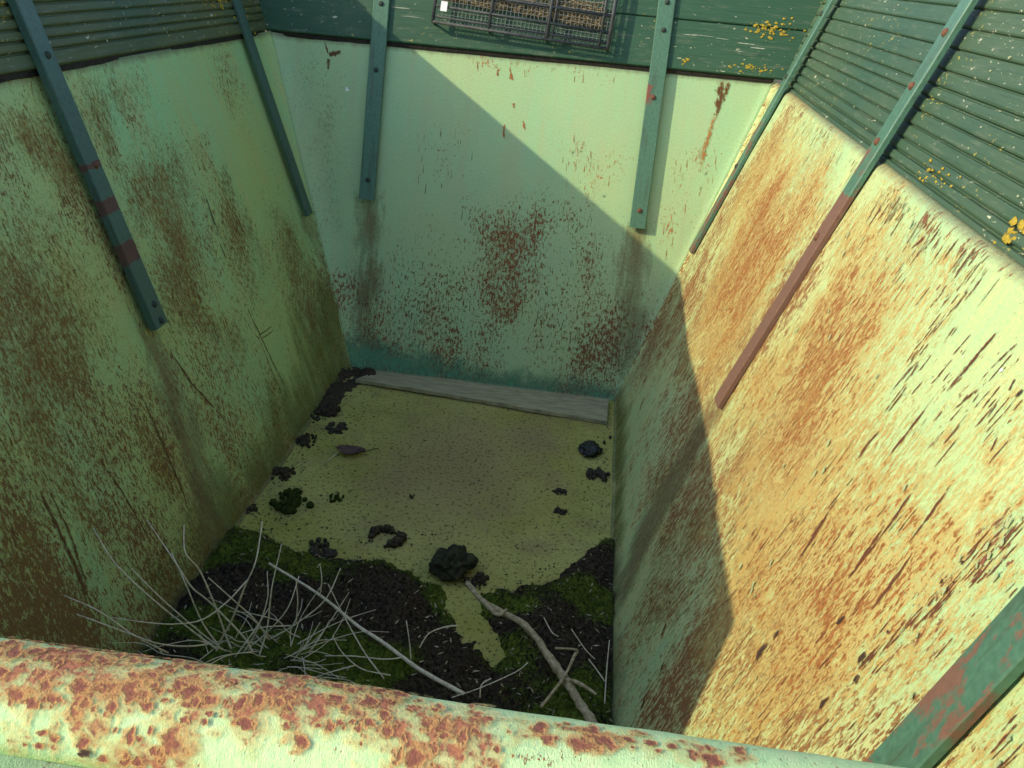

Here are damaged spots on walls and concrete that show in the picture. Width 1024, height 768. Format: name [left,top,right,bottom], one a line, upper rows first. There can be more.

corrosion [0,91,85,207]
corrosion [67,64,285,414]
corrosion [390,131,634,384]
corrosion [653,82,730,261]
corrosion [674,101,857,414]
corrosion [0,172,1024,768]